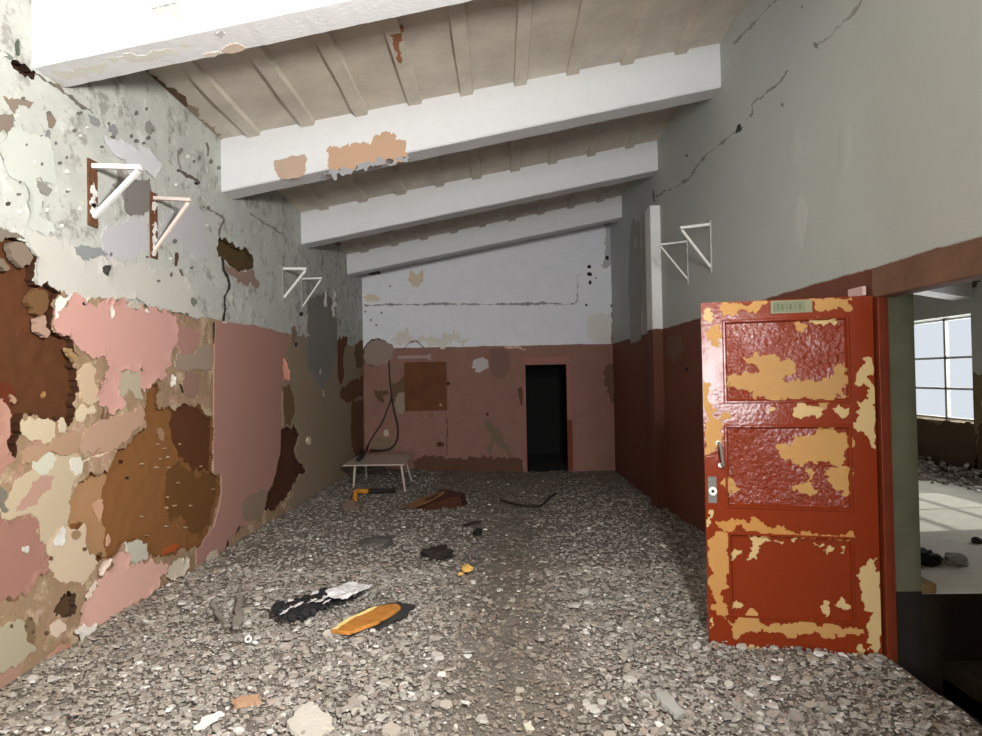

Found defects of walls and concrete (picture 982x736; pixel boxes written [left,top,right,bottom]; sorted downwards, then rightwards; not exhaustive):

spalling [0,39,36,80]
crack [818,0,862,45]
crack [177,142,209,183]
peeling [324,131,409,181]
crack [653,70,788,202]
crack [203,206,231,344]
hole [216,237,254,273]
crack [250,213,283,235]
flaking render [0,237,220,618]
peeling [703,380,732,455]
peeling [726,352,876,497]
peeling [706,509,881,657]